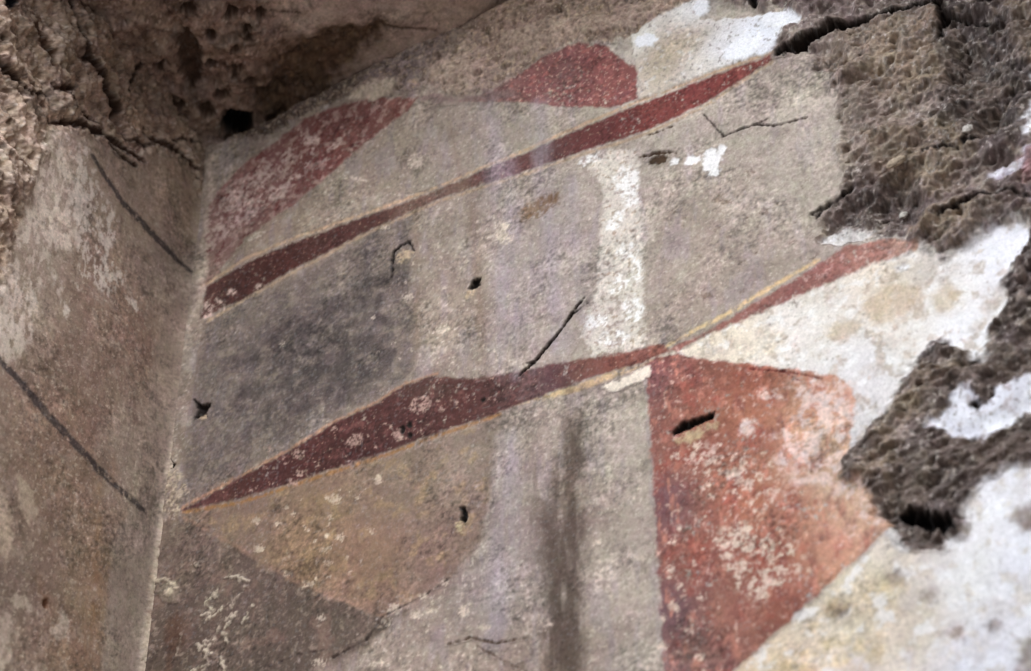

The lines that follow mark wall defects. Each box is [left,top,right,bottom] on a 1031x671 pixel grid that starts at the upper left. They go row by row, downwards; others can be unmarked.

crack [771,0,1010,58]
crack [701,112,808,139]
spalling [0,0,920,367]
damp [443,92,601,386]
crack [514,295,590,380]
peeling [669,0,1031,671]
peeling [601,363,653,393]
peeling [329,392,471,459]
damp [477,374,599,671]
peeling [665,524,687,547]
peeling [642,563,709,623]